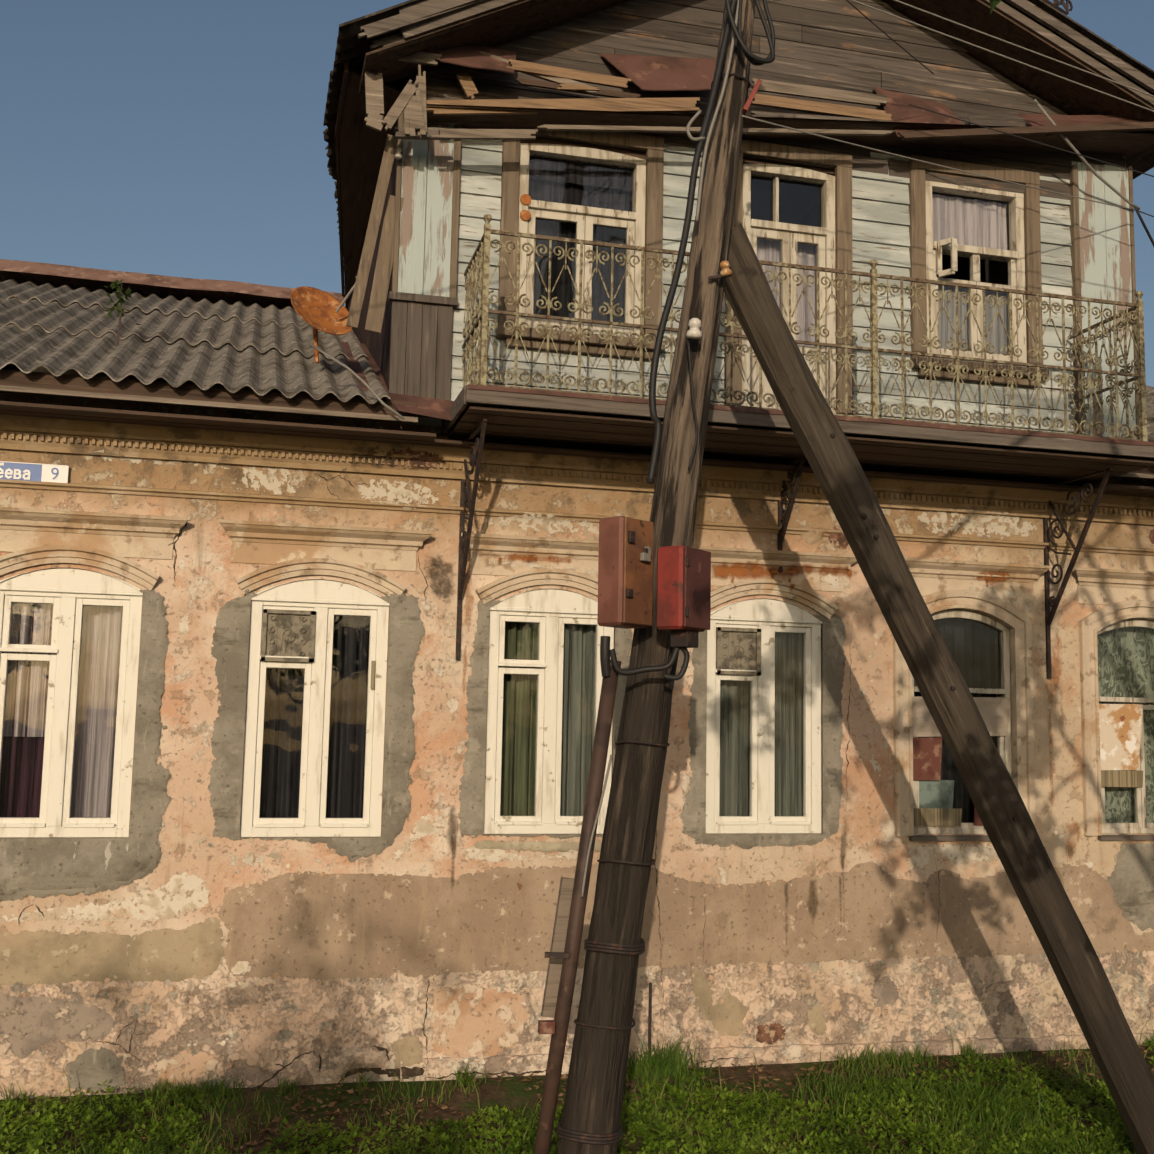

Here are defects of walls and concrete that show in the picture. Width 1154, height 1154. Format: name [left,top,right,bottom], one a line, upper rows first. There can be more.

peeling [356,447,444,510]
crack [169,520,188,580]
peeling [917,509,1039,538]
spalling [0,984,126,1092]
peeling [155,1036,233,1089]
spalling [691,968,796,1054]
spalling [871,975,901,1015]